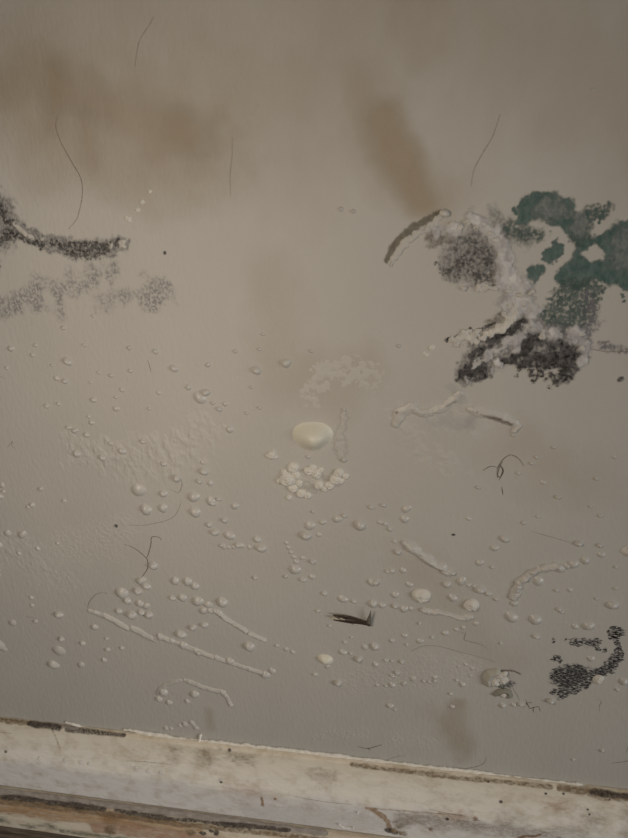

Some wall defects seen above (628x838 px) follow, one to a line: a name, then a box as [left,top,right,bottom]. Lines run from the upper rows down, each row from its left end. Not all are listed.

leakage [385,192,628,389]
leakage [550,626,624,699]